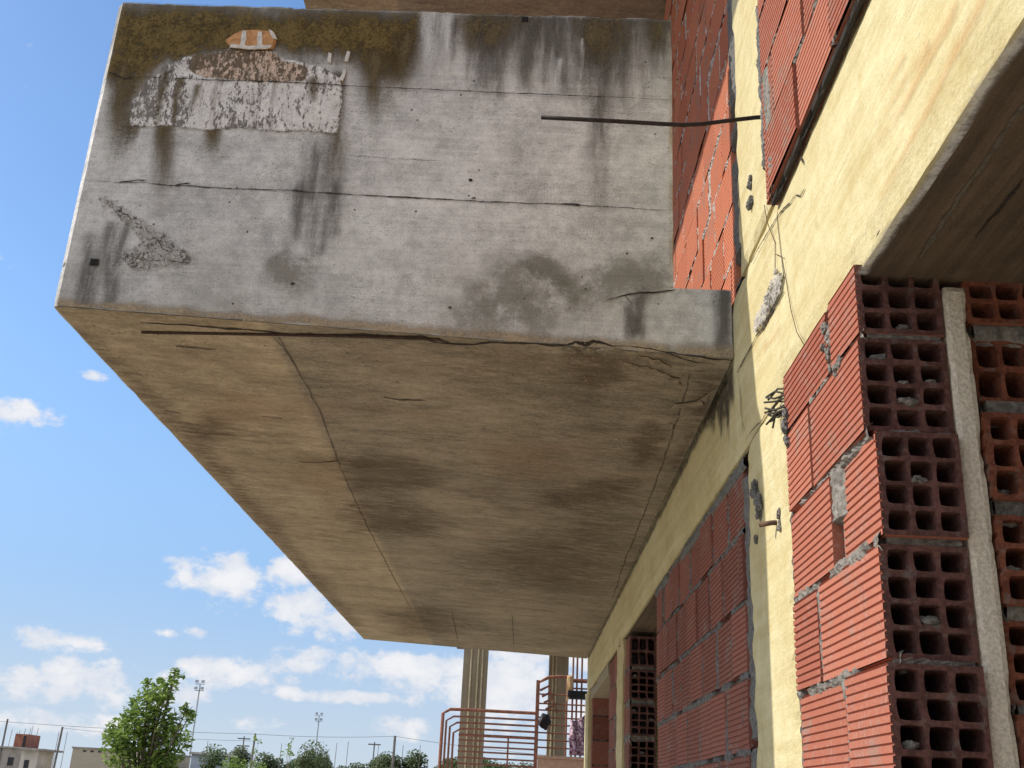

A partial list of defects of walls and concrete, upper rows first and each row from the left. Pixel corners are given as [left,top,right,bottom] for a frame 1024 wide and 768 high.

spalling [130,29,350,134]
water stain [363,12,455,103]
water stain [470,14,671,137]
water stain [294,147,319,235]
crack [89,179,654,210]
water stain [473,257,661,336]
spalling [753,268,784,336]
crack [147,323,567,606]
crack [607,289,784,600]